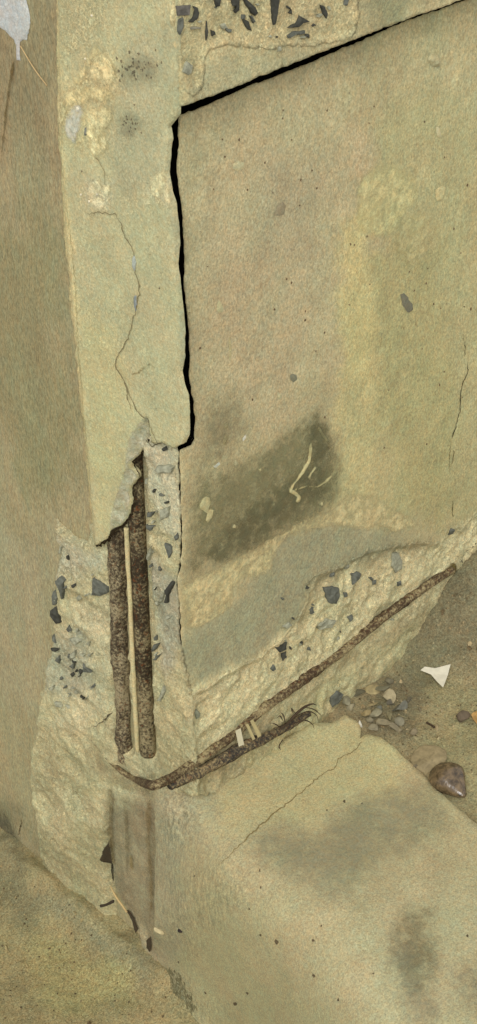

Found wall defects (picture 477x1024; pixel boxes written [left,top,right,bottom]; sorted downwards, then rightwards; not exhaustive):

crack [66,0,464,646]
crack [449,337,469,473]
water stain [192,421,337,571]
spalling [30,432,477,915]
crack [222,742,361,862]